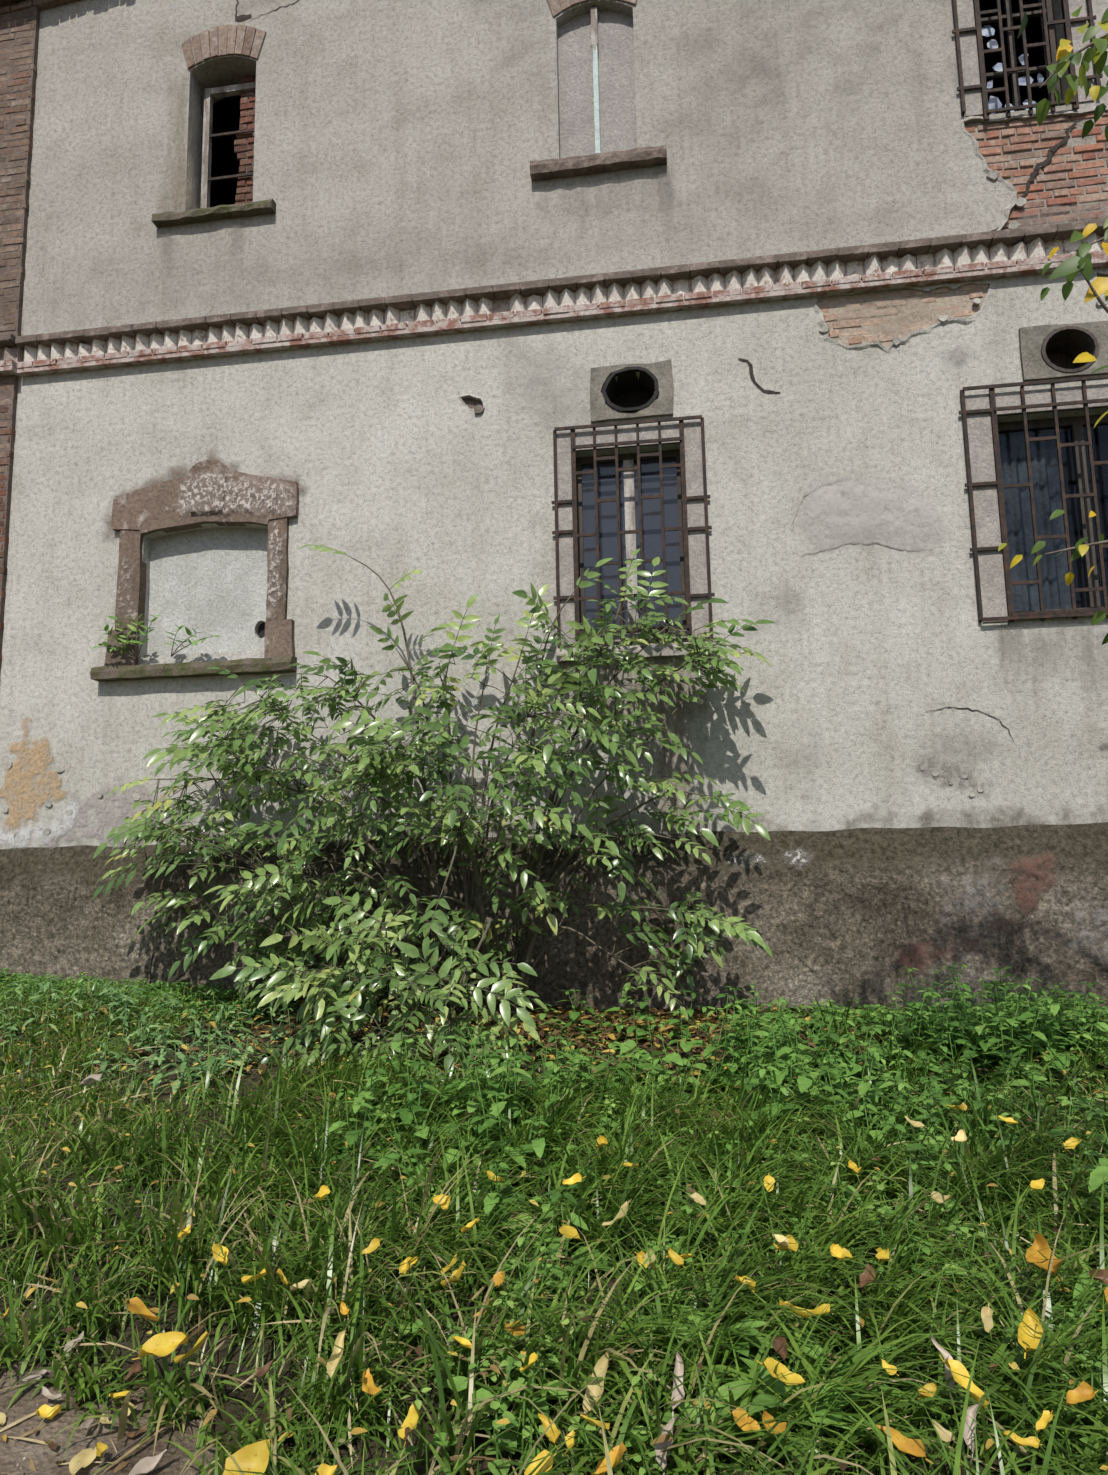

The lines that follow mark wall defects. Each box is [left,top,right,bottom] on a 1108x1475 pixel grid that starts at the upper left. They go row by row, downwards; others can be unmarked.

crack [235,0,298,22]
spalling [959,105,1108,231]
spalling [813,281,993,353]
crack [739,358,780,394]
spalling [459,394,485,414]
crack [925,707,1014,742]
peeling [0,719,190,847]